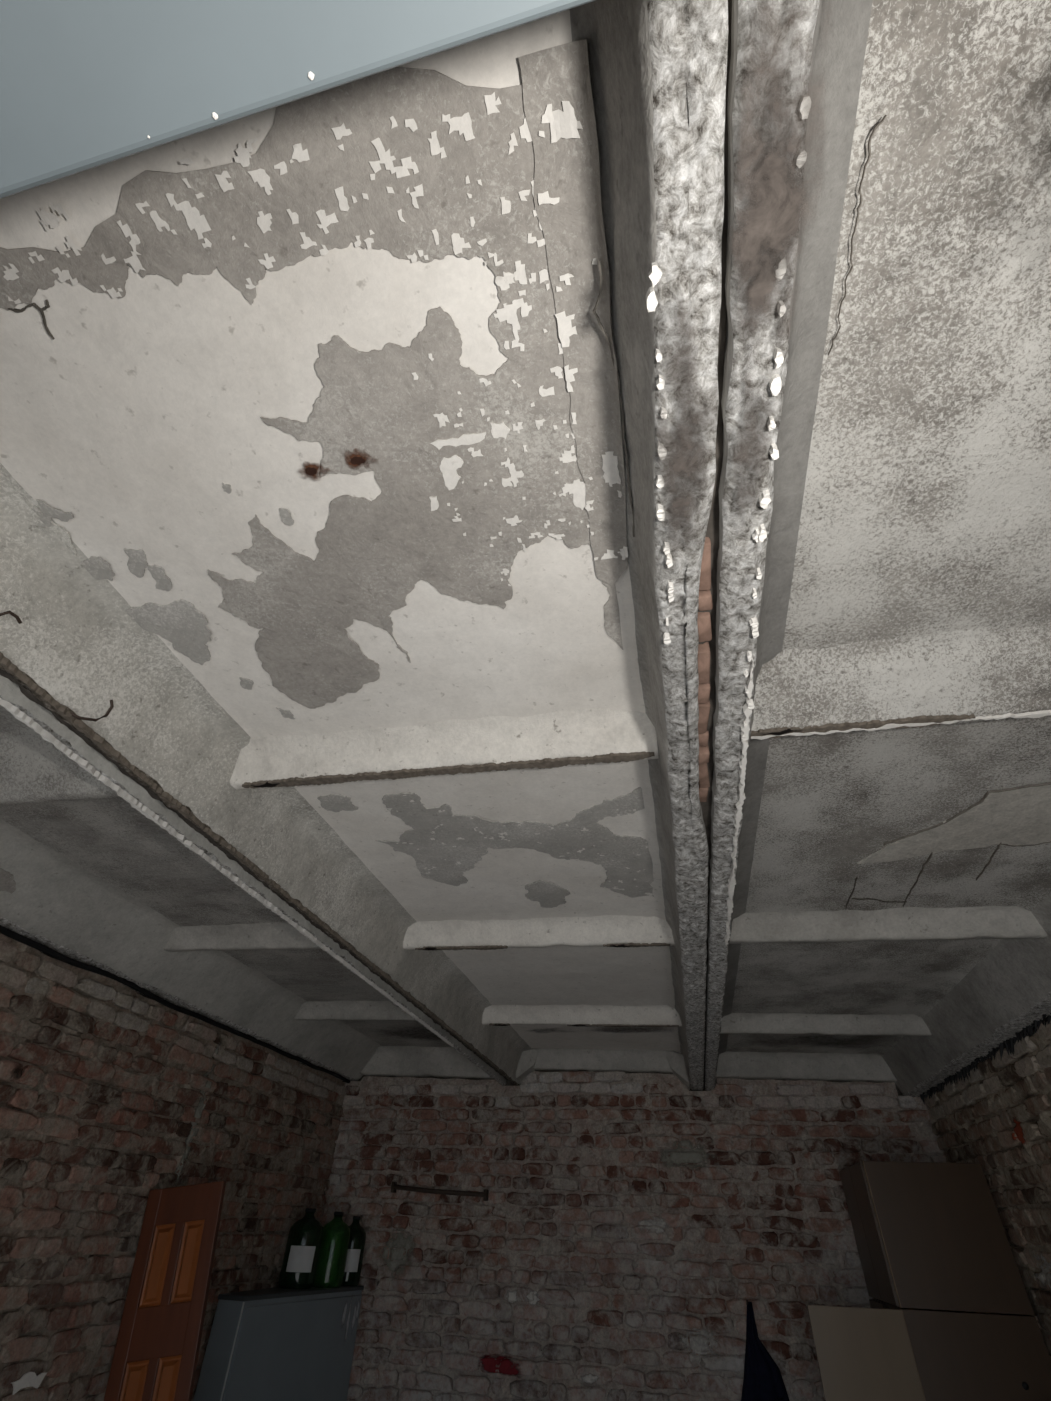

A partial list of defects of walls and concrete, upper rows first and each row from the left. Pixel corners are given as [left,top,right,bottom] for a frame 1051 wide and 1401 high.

crack [8,299,55,340]
rust [299,462,322,480]
peeling [0,40,628,719]
rust [345,449,369,468]
peeling [646,262,662,312]
peeling [656,441,667,521]
leakage [660,317,712,550]
leakage [734,385,768,508]
leakage [733,6,823,337]
crack [828,115,887,355]
peeling [242,751,655,898]
crack [846,782,1051,909]